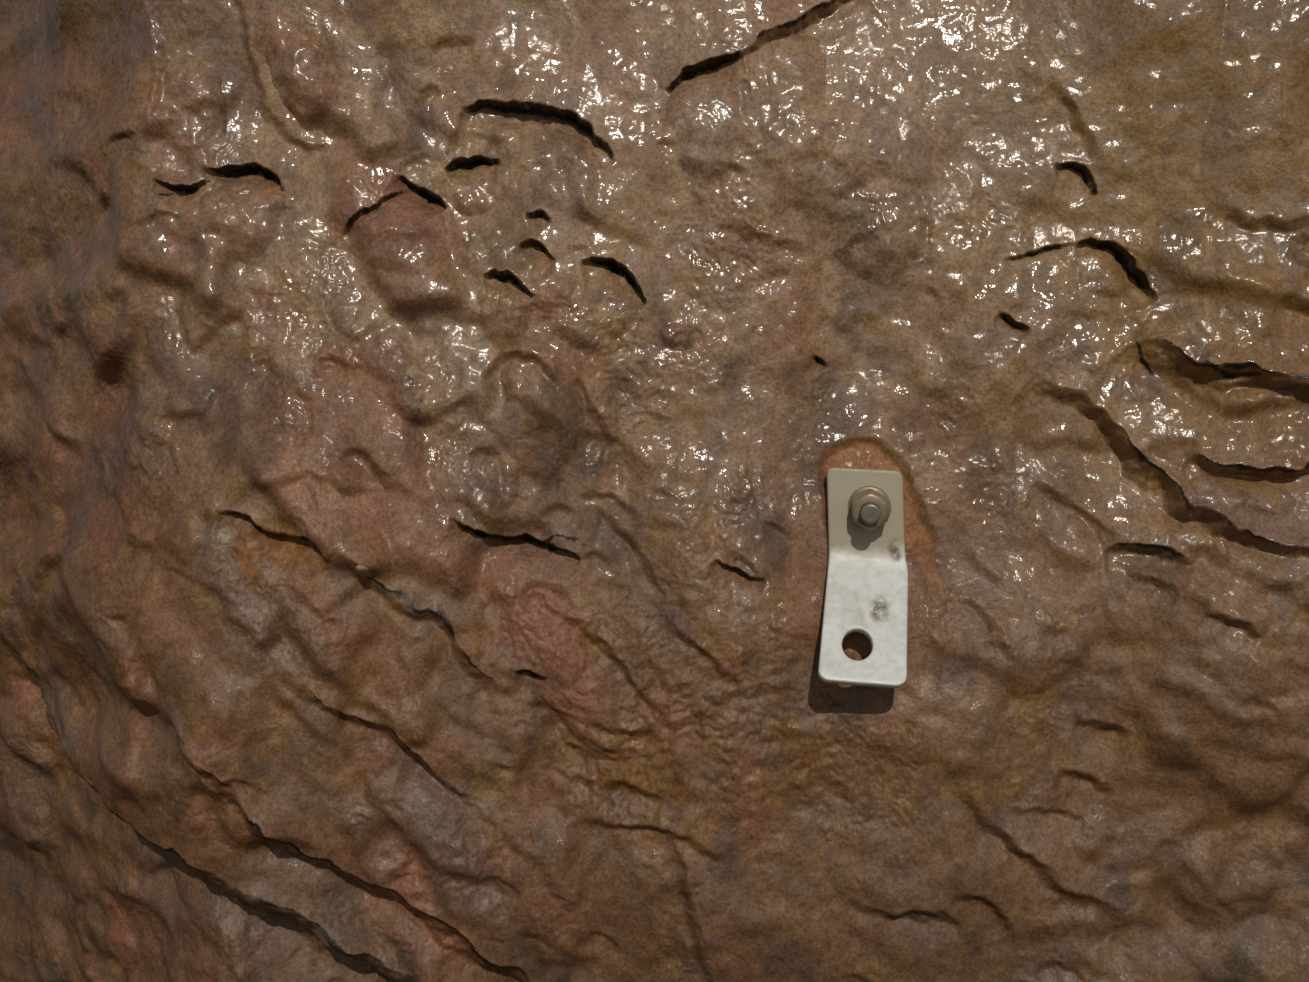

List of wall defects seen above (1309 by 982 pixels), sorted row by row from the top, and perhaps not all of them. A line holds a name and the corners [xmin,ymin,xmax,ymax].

crack [668,0,836,90]
crack [468,99,612,154]
crack [155,164,284,196]
crack [347,155,498,226]
crack [589,257,646,303]
crack [1016,238,1152,291]
crack [1136,339,1309,379]
crack [233,512,316,546]
crack [458,522,578,557]
crack [354,562,544,679]